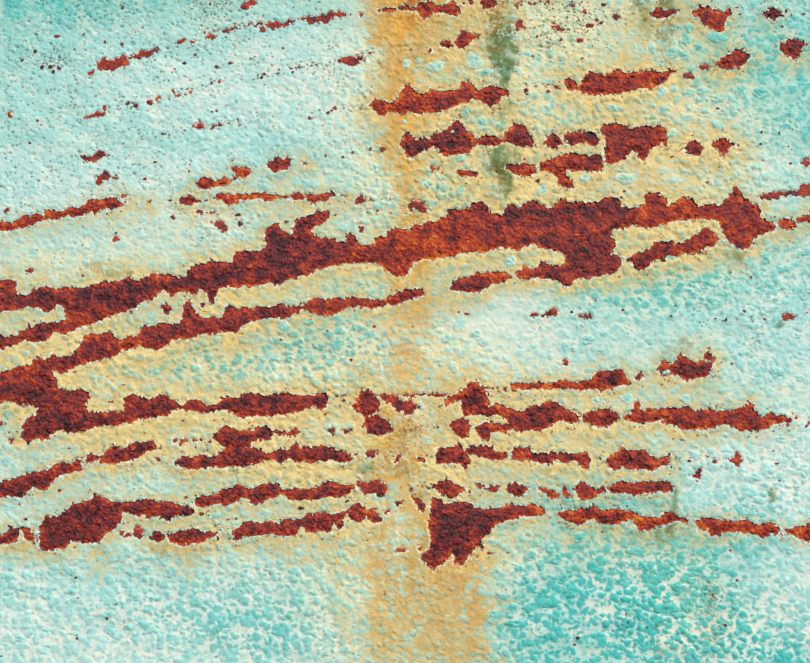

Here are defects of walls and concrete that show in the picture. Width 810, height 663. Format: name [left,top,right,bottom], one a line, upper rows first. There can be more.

water stain [489,30,510,69]
water stain [490,146,516,193]
rust [0,154,810,663]